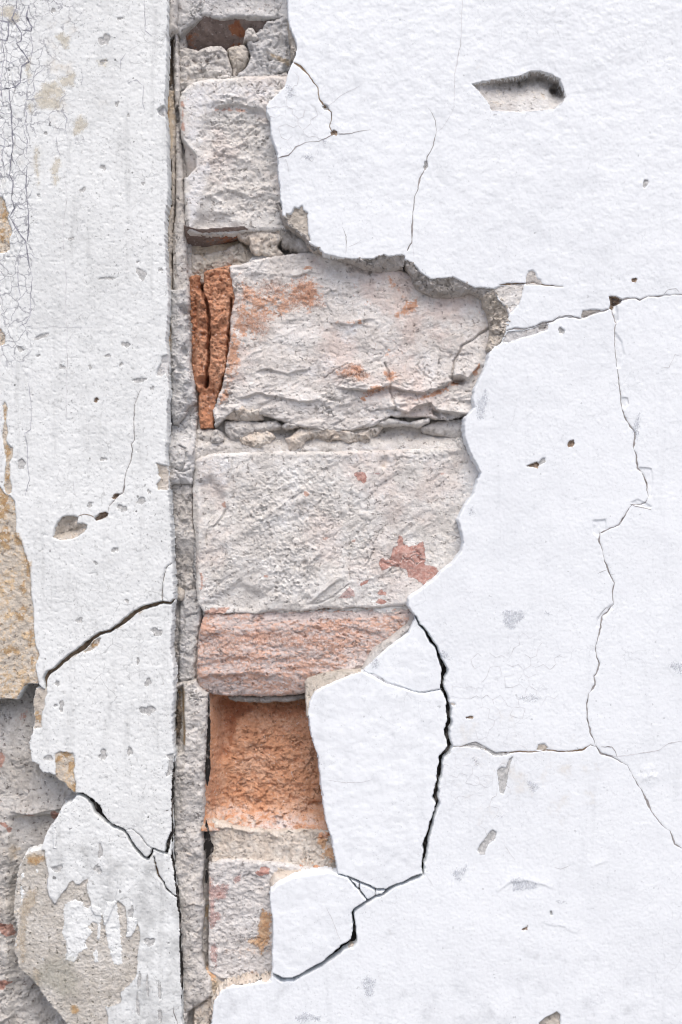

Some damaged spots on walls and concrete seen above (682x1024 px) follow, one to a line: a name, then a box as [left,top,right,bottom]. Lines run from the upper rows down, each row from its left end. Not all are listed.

spalling [287,22,297,62]
crack [268,62,366,171]
spalling [474,72,567,112]
spalling [277,203,564,353]
spalling [0,402,64,728]
crack [45,563,175,685]
spalling [304,612,414,717]
crack [363,288,682,884]
peeling [464,742,513,794]
peeling [14,821,163,1024]
crack [82,756,184,1021]
crack [326,881,386,958]